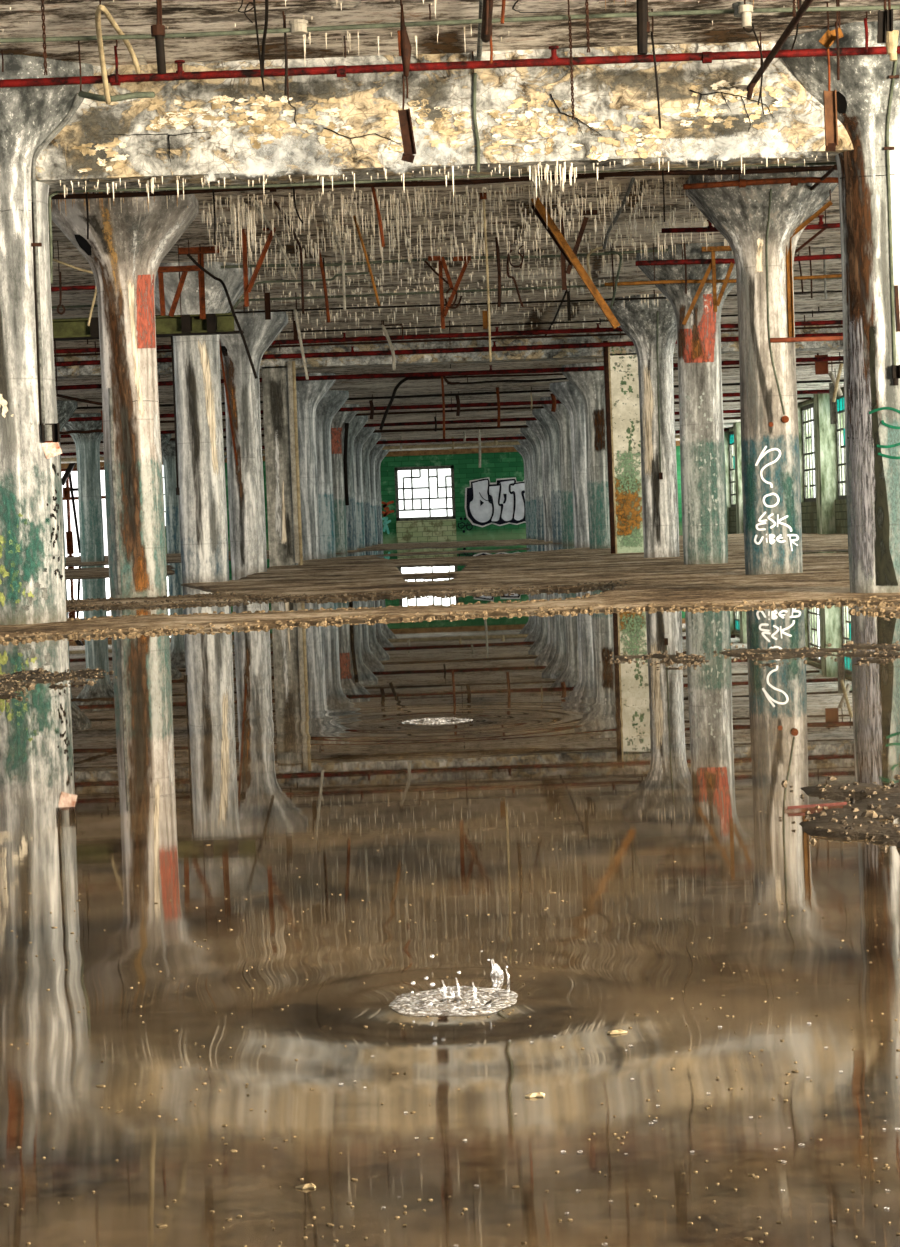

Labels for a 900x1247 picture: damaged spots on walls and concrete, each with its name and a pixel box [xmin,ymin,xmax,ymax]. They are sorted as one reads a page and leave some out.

peeling [145,95,354,150]
peeling [380,80,790,162]
peeling [70,137,130,173]
rust [838,113,879,444]
rust [678,305,703,359]
peeling [0,394,14,418]
rust [89,208,150,591]